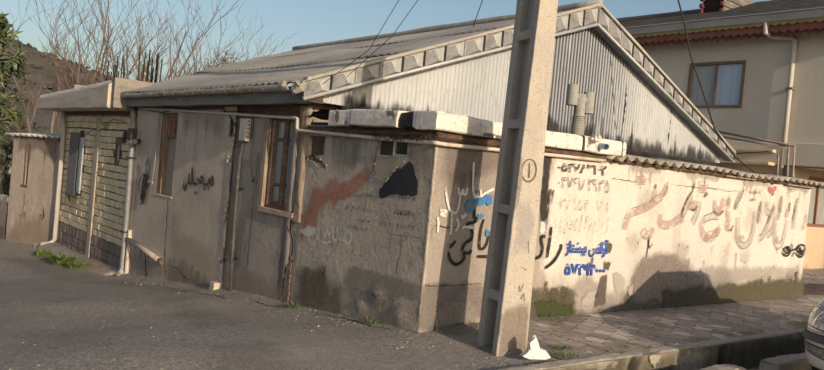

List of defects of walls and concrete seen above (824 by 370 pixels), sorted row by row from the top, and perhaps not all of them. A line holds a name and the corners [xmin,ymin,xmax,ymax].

crack [388,225,457,279]
leakage [347,267,483,331]
leakage [544,282,567,301]
leakage [582,254,799,307]